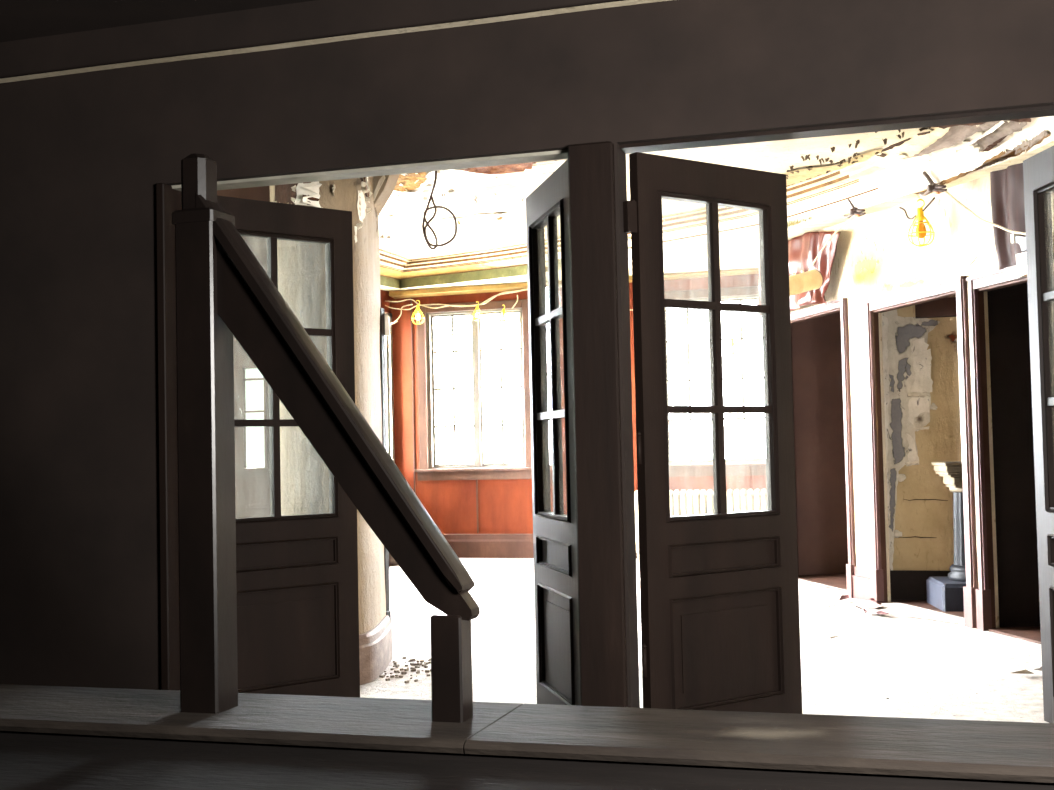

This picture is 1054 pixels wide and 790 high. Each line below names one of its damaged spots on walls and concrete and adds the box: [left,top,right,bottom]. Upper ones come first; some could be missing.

peeling [783,130,904,186]
spalling [898,118,1049,170]
peeling [354,162,540,243]
peeling [882,315,938,538]